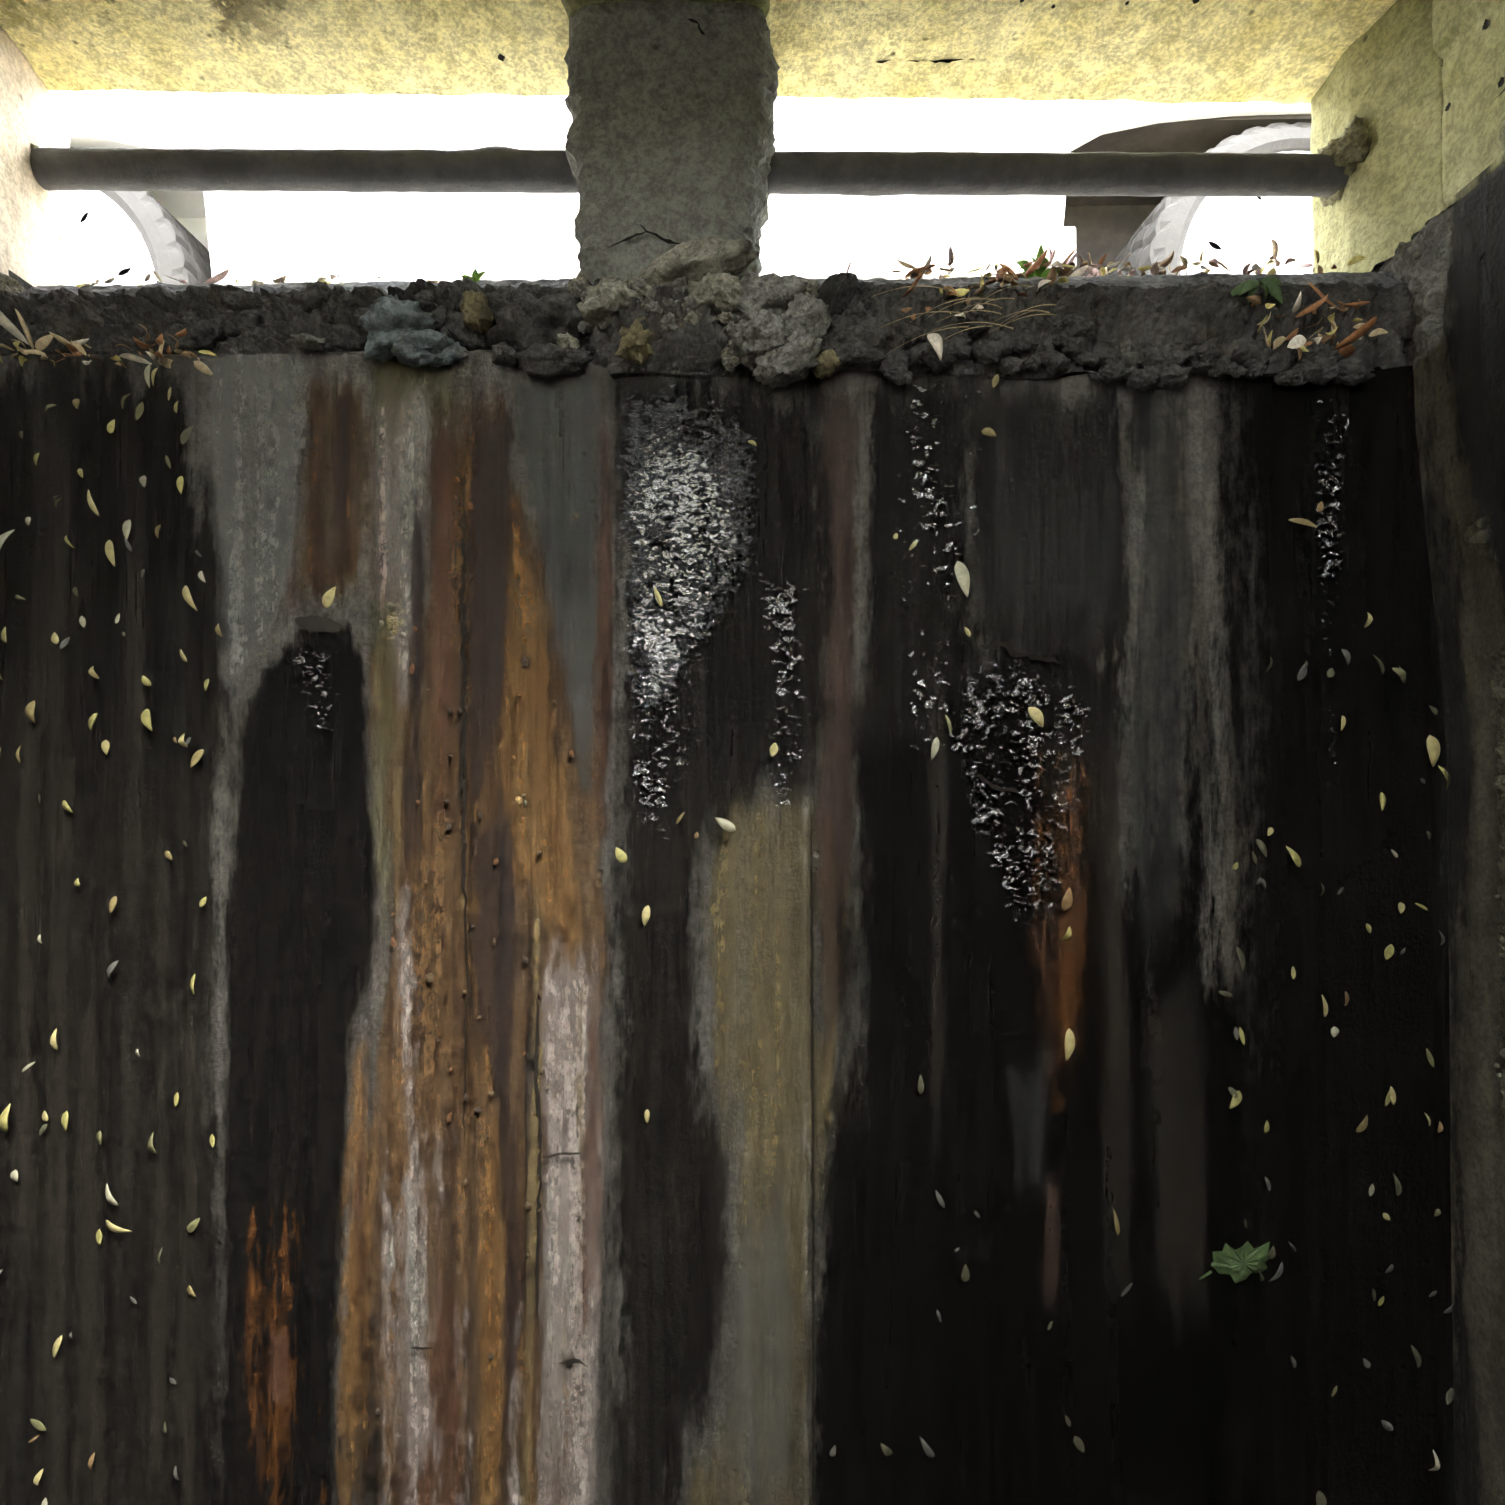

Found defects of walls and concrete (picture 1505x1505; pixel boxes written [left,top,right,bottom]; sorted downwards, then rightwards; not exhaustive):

water stain [0,351,438,1505]
corrosion [245,1194,296,1505]
corrosion [321,382,612,1505]
water stain [462,338,1482,1505]
water stain [1444,127,1505,598]